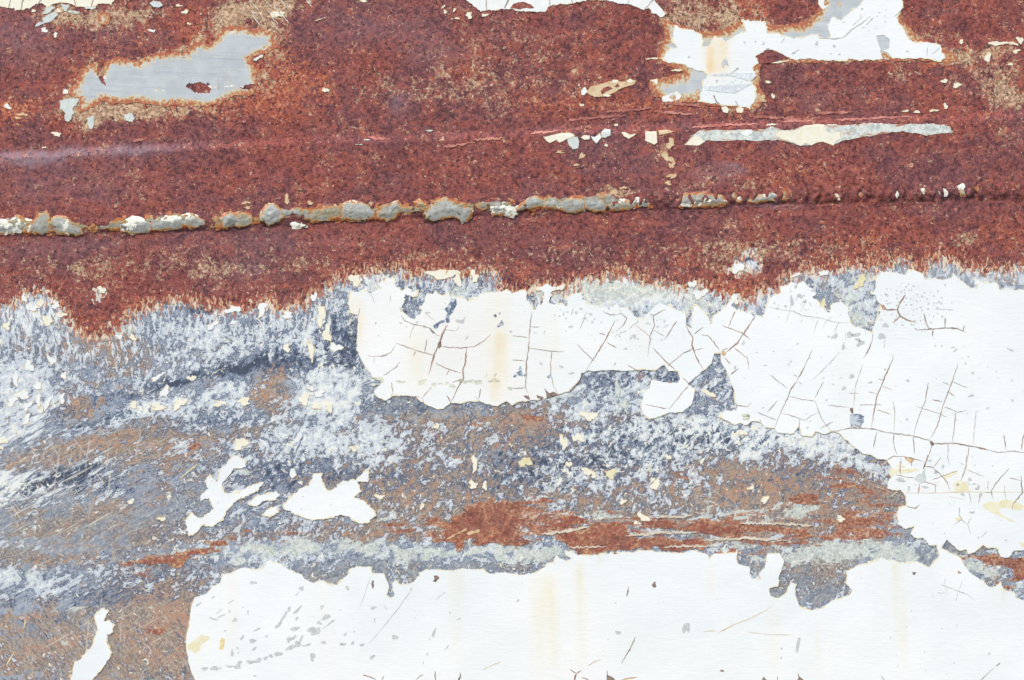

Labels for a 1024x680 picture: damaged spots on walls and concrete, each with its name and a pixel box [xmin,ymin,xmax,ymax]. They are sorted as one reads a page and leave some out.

peeling [59,0,289,129]
peeling [467,0,586,12]
peeling [599,0,958,113]
corrosion [0,0,1024,340]
peeling [685,122,953,146]
crack [359,293,490,403]
corrosion [432,501,530,551]
peeling [0,247,1024,680]
corrosion [542,515,820,555]
crack [512,295,1024,534]
corrosion [789,493,821,504]